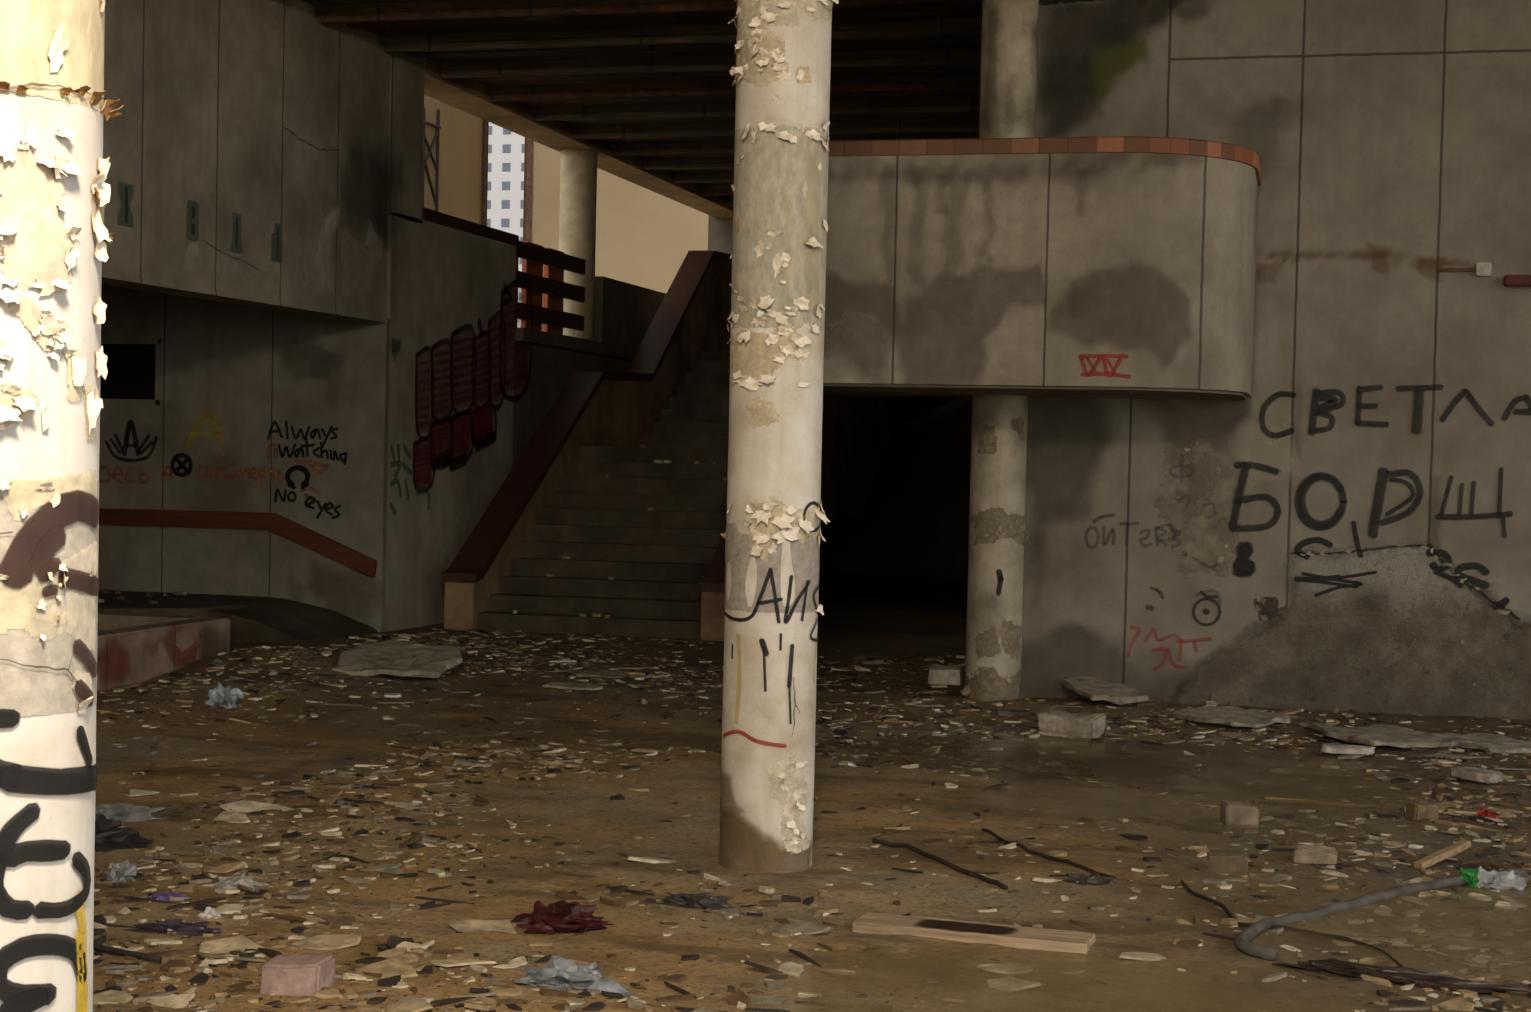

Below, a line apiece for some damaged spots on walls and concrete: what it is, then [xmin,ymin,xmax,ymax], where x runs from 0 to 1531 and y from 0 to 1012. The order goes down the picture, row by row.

peeling [0,0,124,121]
peeling [728,0,839,103]
leakage [1042,0,1171,135]
peeling [0,122,113,440]
peeling [727,121,830,428]
crack [0,655,79,685]
peeling [0,471,99,717]
peeling [720,497,830,615]
spalling [1177,541,1531,720]
peeling [767,756,809,854]